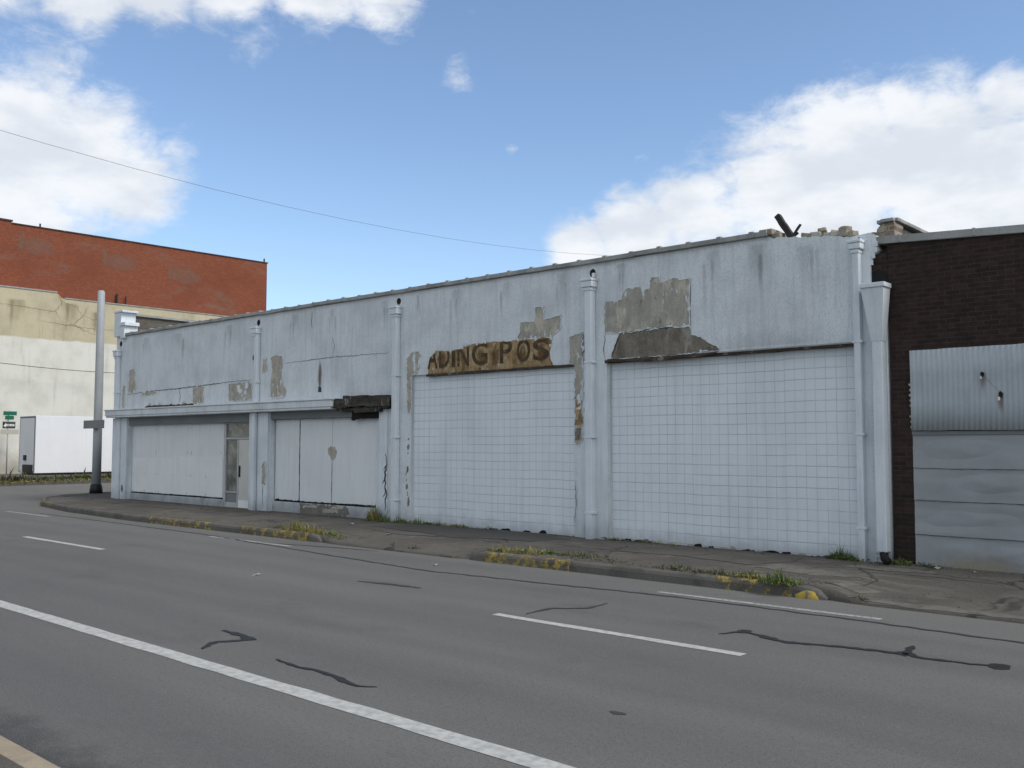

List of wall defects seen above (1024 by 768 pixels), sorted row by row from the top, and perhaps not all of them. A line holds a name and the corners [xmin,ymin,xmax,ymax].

peeling [603,275,719,359]
peeling [121,369,157,408]
peeling [192,385,204,405]
peeling [228,381,252,402]
peeling [262,353,286,400]
peeling [406,306,585,446]
crack [380,454,388,508]